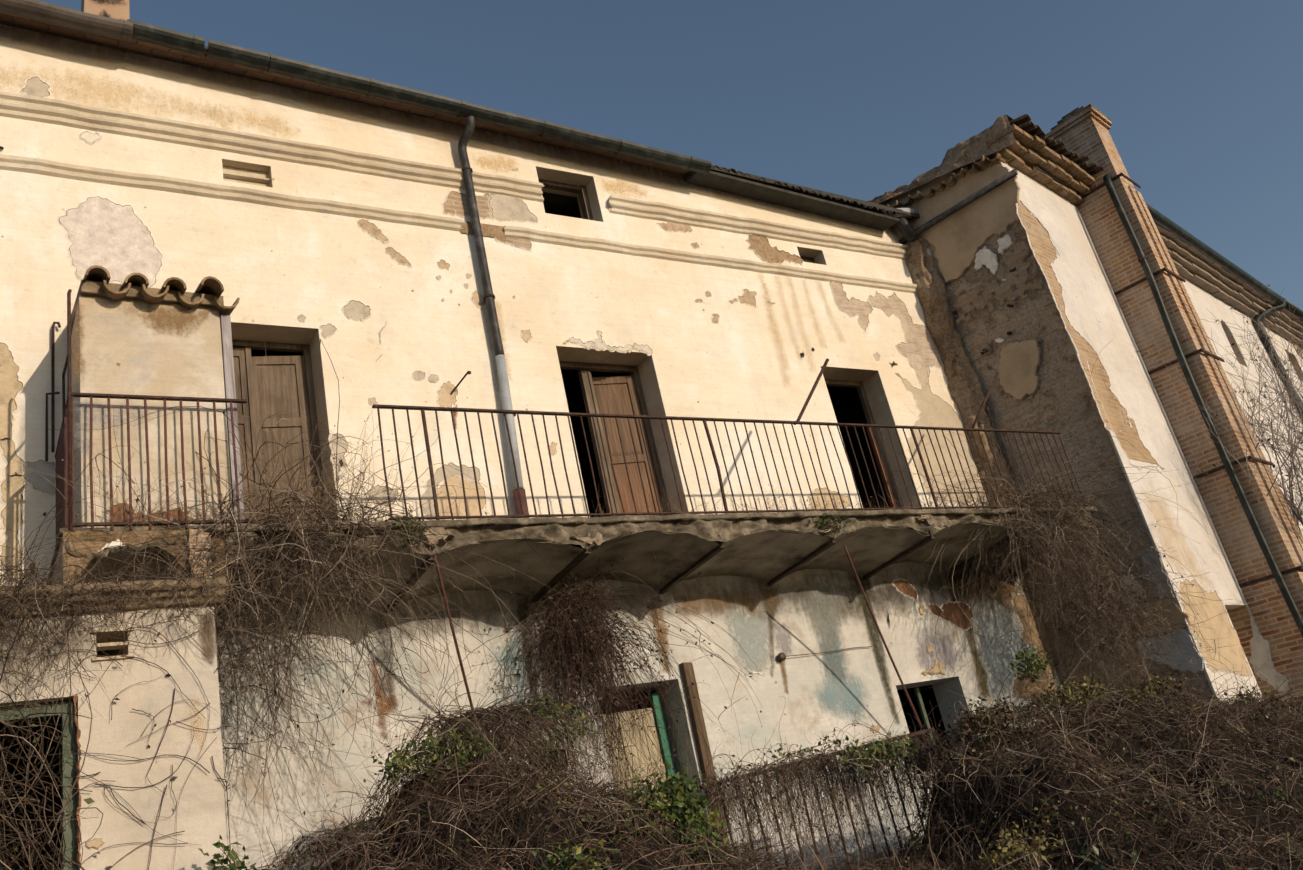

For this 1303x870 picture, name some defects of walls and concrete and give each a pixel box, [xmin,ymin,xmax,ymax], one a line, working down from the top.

peeling [57,195,164,288]
peeling [441,190,539,251]
spalling [745,234,804,266]
peeling [297,300,372,339]
peeling [886,163,1165,471]
peeling [828,281,988,533]
peeling [0,340,56,585]
peeling [418,461,488,550]
damp [372,563,1020,690]
peeling [891,578,974,631]
peeling [1178,577,1290,693]
rust [366,661,397,737]